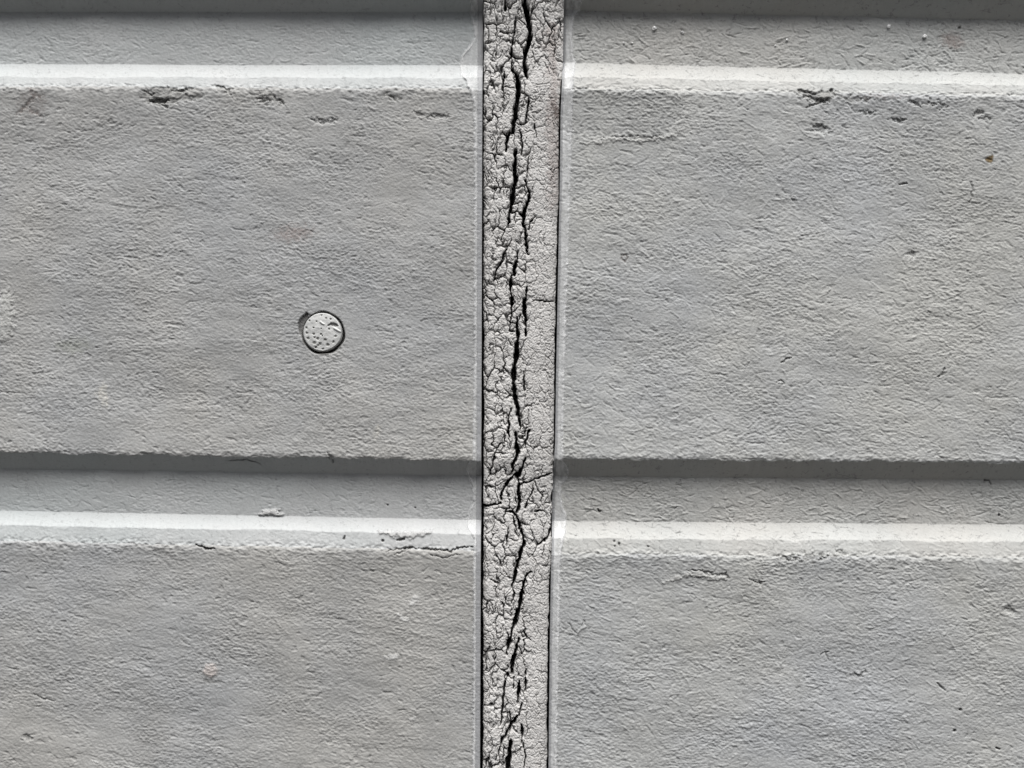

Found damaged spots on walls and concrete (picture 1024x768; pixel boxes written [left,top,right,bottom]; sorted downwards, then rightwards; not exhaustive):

crack [482,0,561,768]